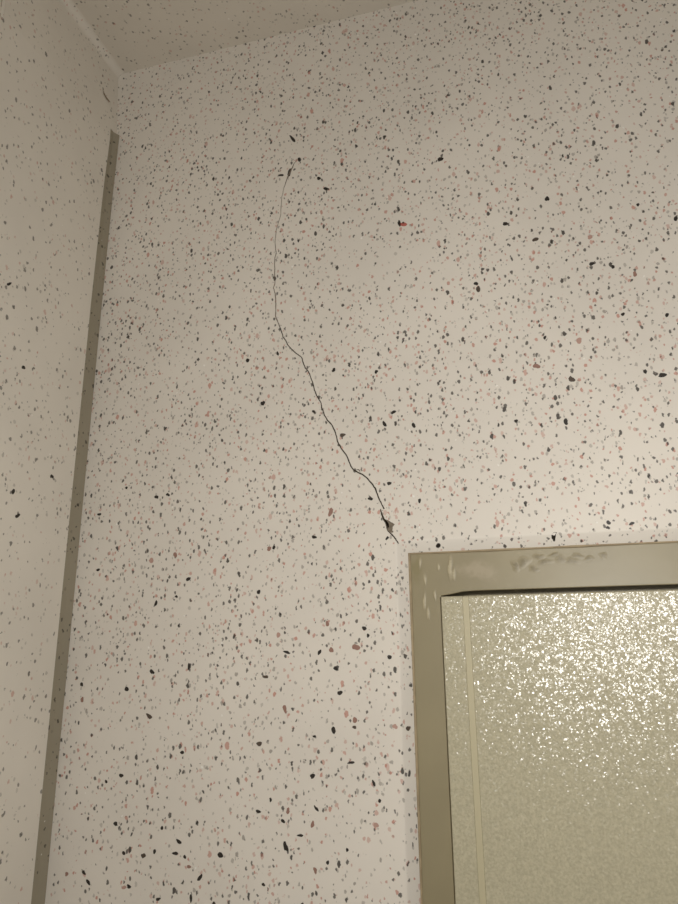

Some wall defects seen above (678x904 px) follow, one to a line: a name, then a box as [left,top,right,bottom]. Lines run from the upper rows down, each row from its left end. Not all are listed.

crack [273,161,399,544]